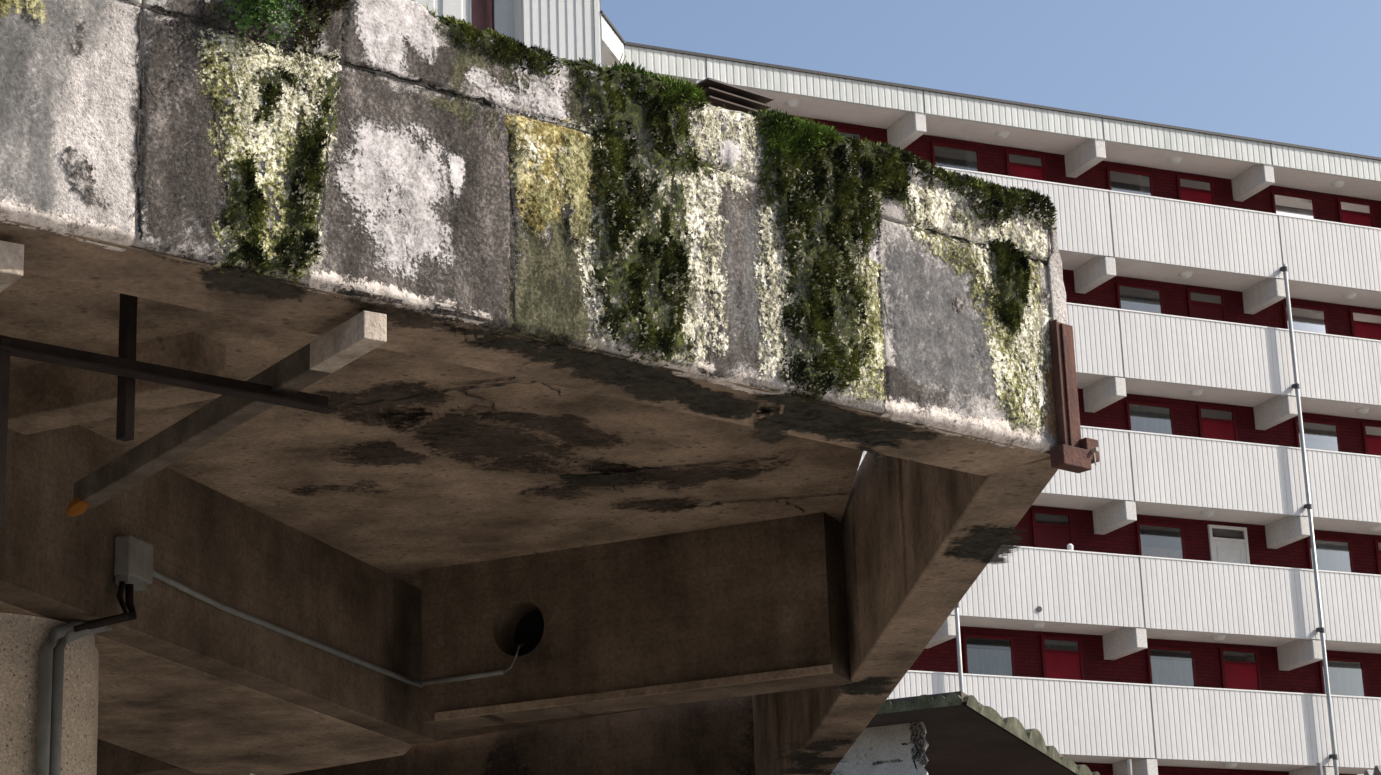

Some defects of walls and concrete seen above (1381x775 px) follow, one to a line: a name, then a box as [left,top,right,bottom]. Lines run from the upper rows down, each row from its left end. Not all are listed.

crack [124,0,606,319]
leakage [0,0,1056,528]
leakage [943,524,1027,564]